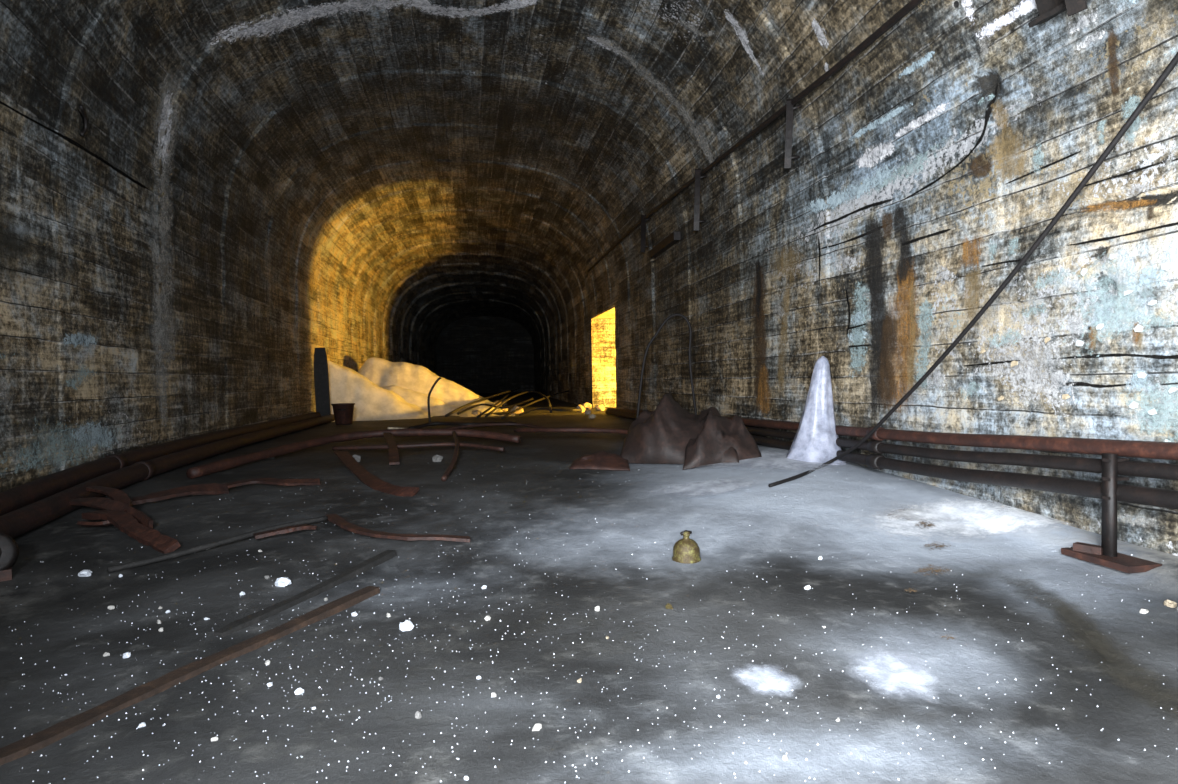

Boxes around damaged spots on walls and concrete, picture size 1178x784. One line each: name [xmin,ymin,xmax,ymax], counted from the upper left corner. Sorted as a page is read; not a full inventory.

rust [865,204,918,414]